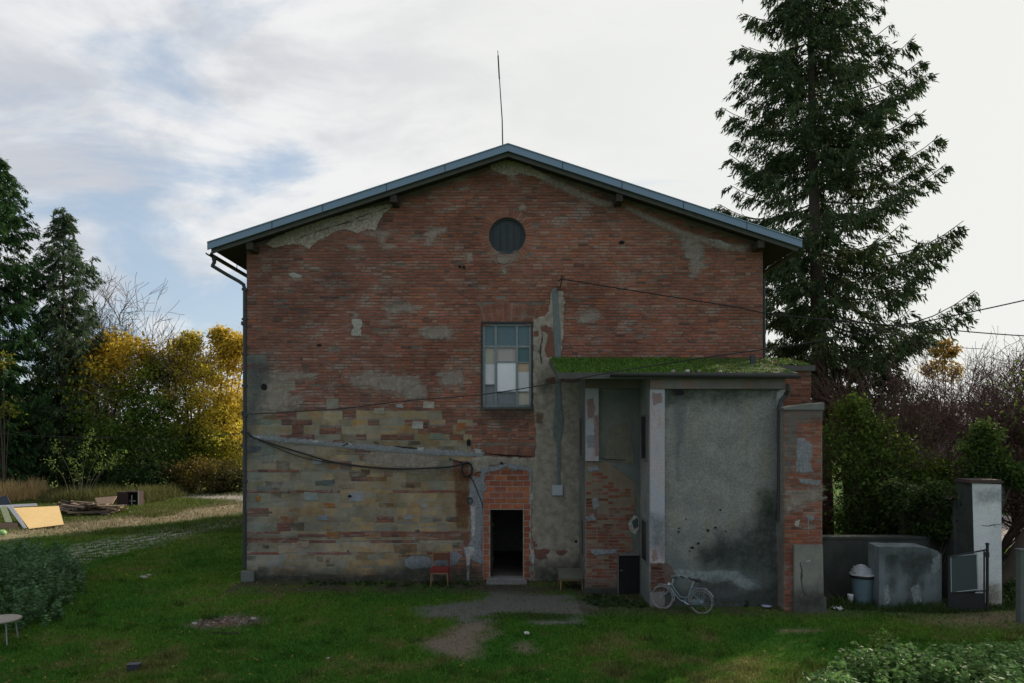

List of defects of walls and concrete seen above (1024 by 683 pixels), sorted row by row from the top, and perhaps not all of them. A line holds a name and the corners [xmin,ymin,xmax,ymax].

flaking render [266,204,398,250]
flaking render [490,160,748,252]
flaking render [533,325,555,358]
peeling [464,506,476,581]
water stain [706,486,828,570]